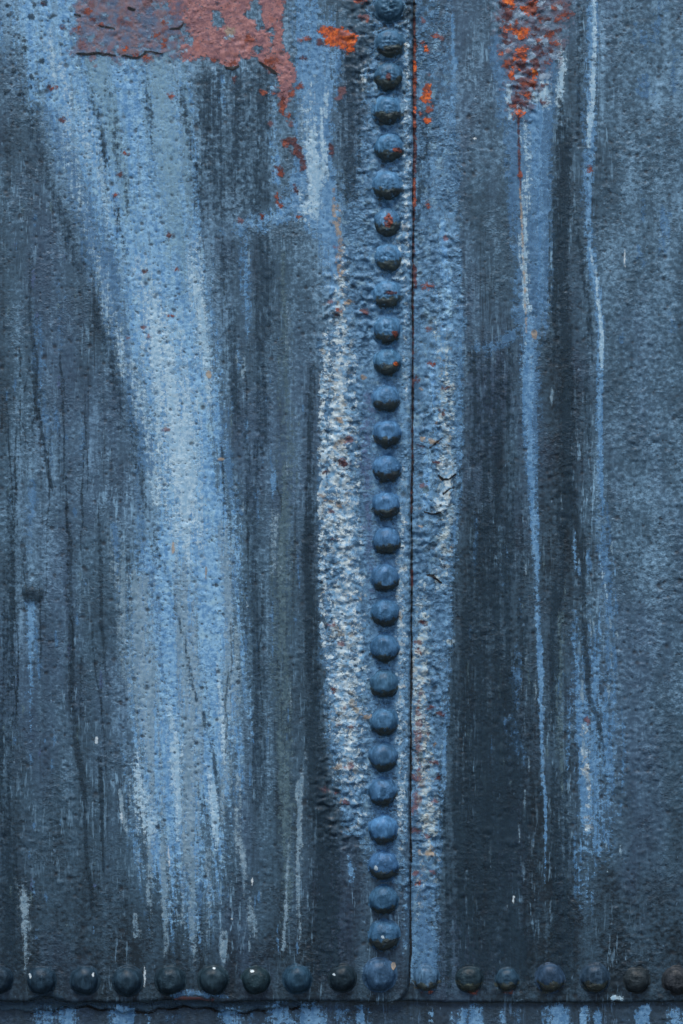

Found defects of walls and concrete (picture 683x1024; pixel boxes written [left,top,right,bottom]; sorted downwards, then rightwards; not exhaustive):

corrosion [60,0,190,67]
corrosion [298,25,359,55]
corrosion [393,18,443,359]
corrosion [491,0,575,332]